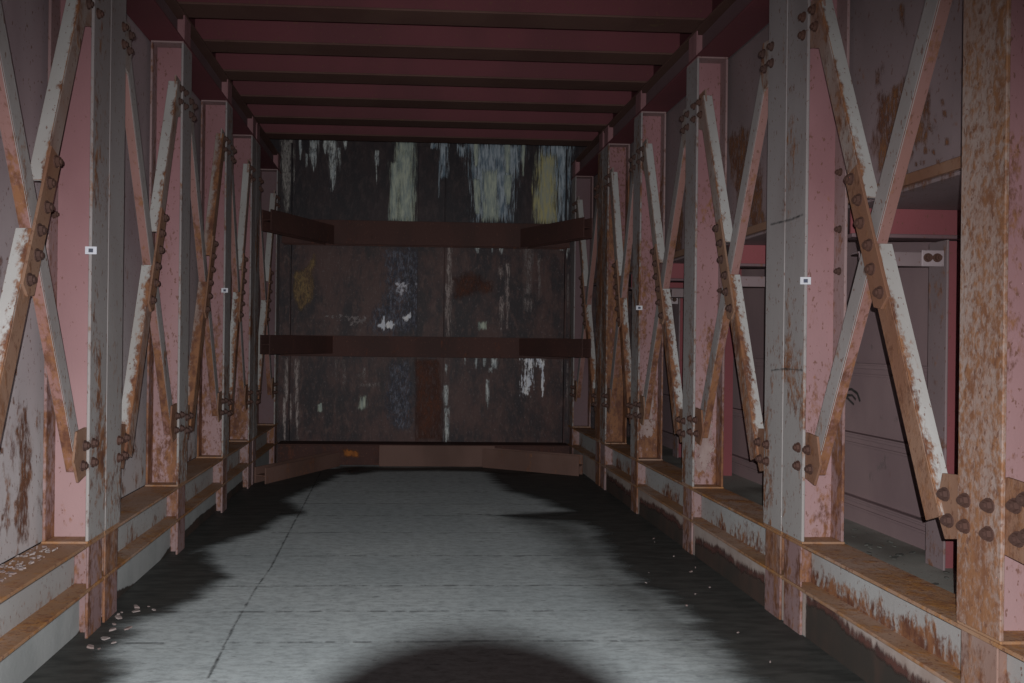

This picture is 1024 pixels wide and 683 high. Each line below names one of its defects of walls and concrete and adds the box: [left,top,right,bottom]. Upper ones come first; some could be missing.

corrosion [873,79,905,171]
corrosion [911,94,949,166]
damp [281,139,347,212]
damp [388,142,416,221]
damp [431,143,572,224]
damp [519,358,545,397]
corrosion [11,389,30,541]